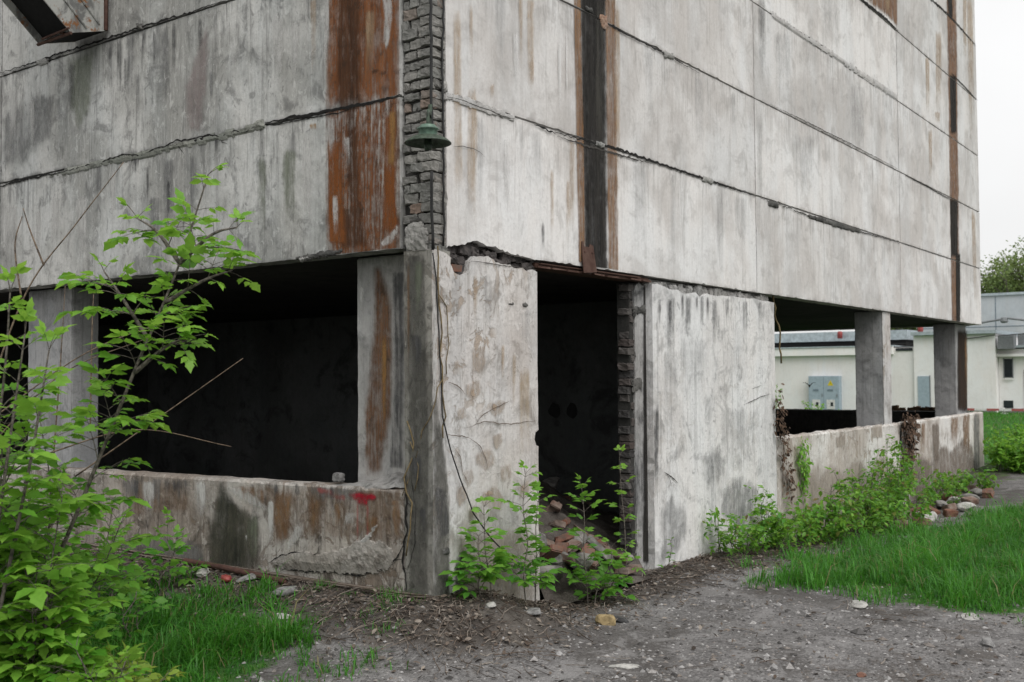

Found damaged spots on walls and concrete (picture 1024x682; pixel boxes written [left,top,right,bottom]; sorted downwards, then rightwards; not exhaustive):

corrosion [310,0,400,254]
spalling [447,242,539,276]
corrosion [926,0,973,411]
leakage [122,480,278,568]
corrosion [360,269,410,470]
crack [448,401,532,484]